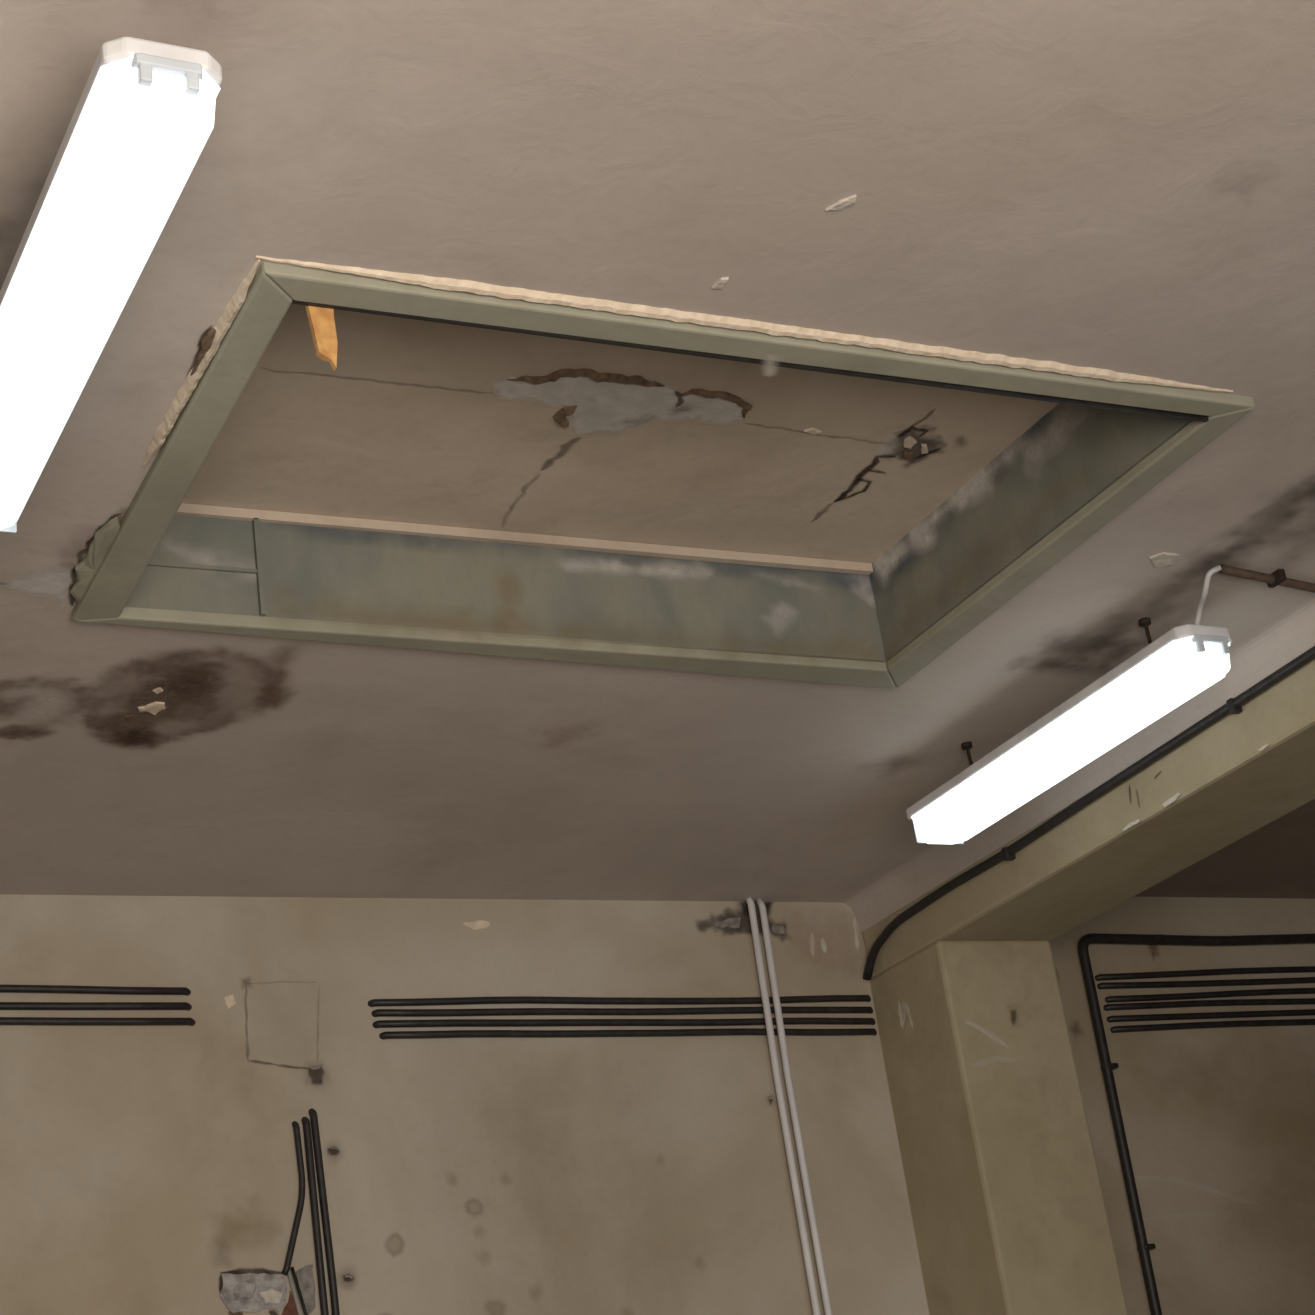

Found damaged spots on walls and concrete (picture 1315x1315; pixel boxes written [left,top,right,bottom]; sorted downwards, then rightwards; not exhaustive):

peeling [494,368,753,433]
leakage [113,675,171,741]